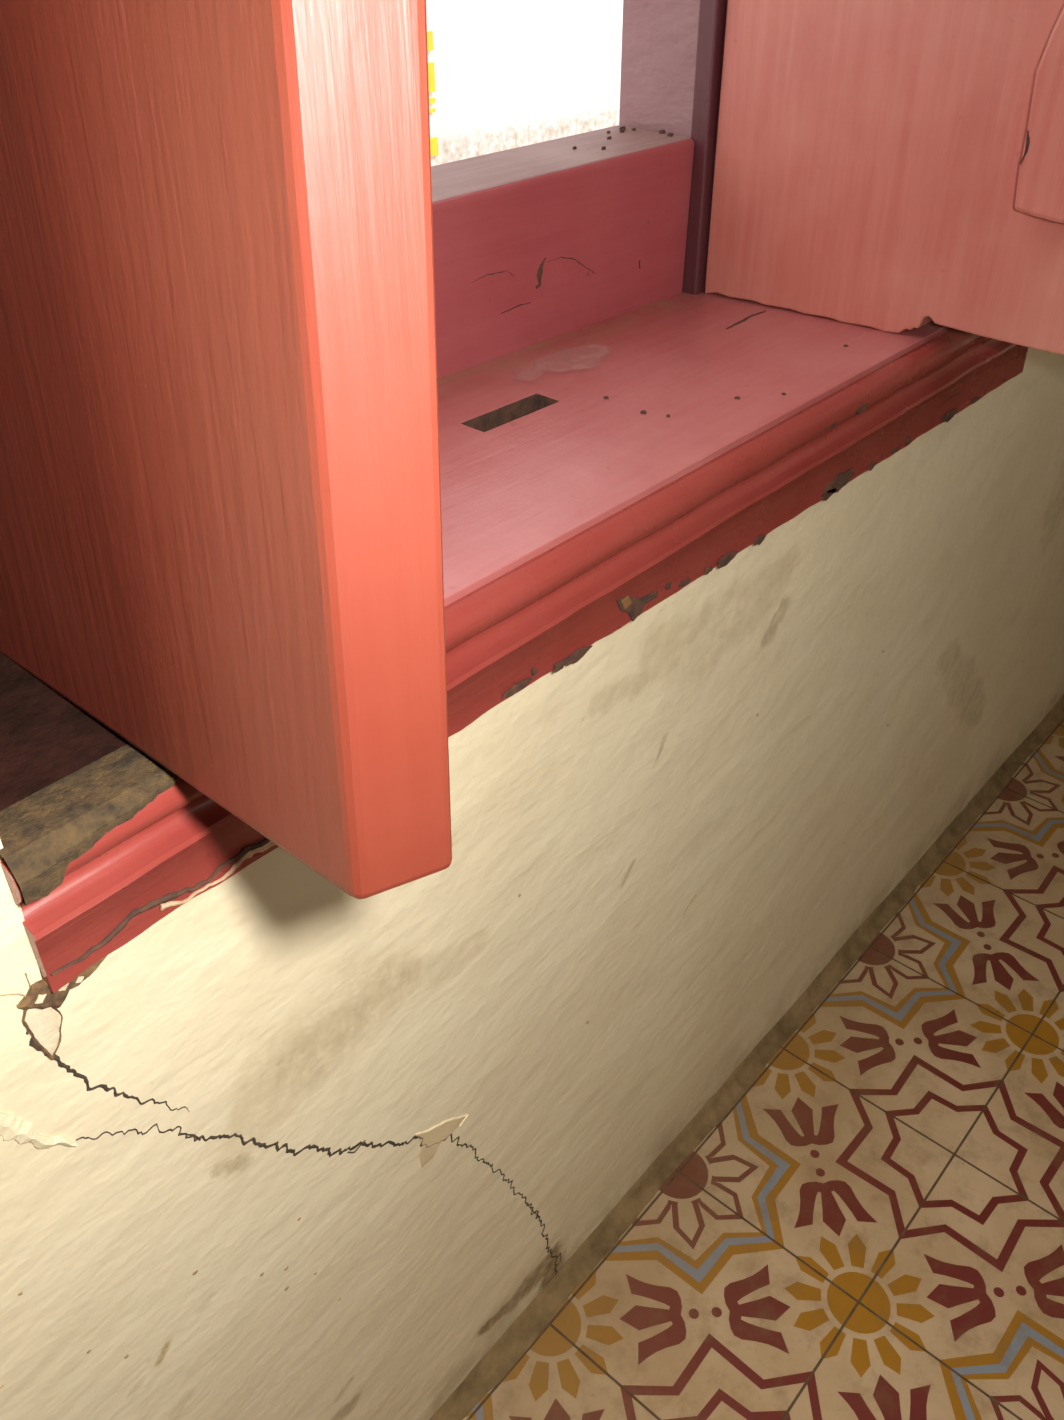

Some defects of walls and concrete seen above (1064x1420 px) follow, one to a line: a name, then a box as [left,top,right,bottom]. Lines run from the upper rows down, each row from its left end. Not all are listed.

crack [472,257,595,314]
peeling [942,397,980,422]
peeling [822,462,877,501]
peeling [616,551,738,621]
peeling [502,645,592,698]
crack [0,838,276,997]
crack [26,1031,561,1276]
peeling [415,1114,468,1168]